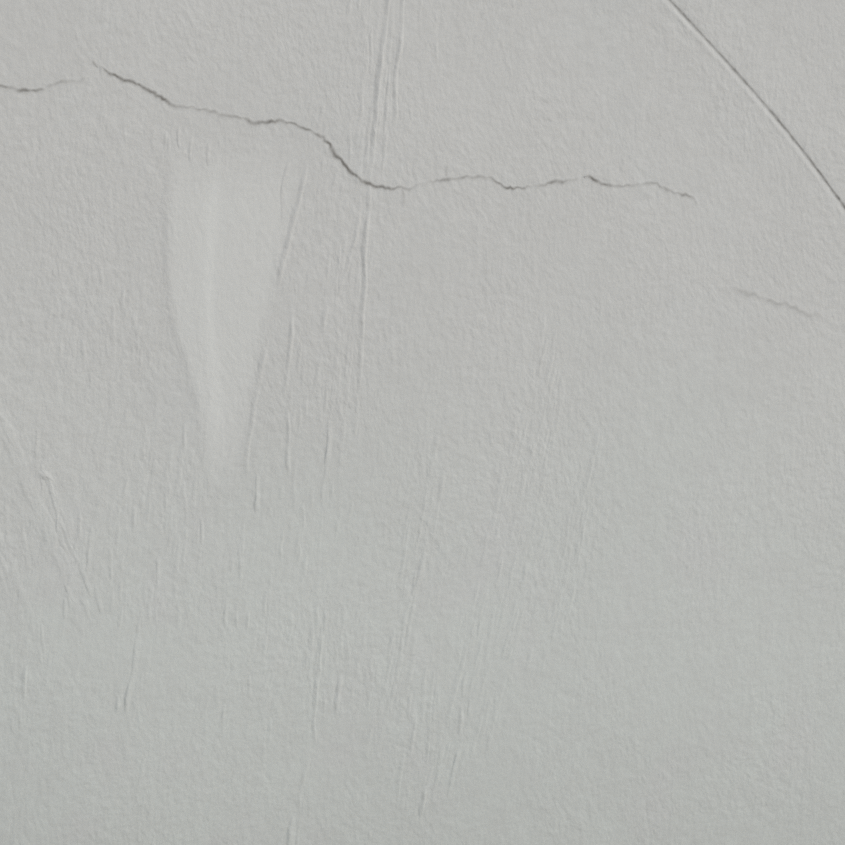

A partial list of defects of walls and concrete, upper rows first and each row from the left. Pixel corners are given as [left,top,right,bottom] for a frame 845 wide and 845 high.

crack [0,59,699,208]